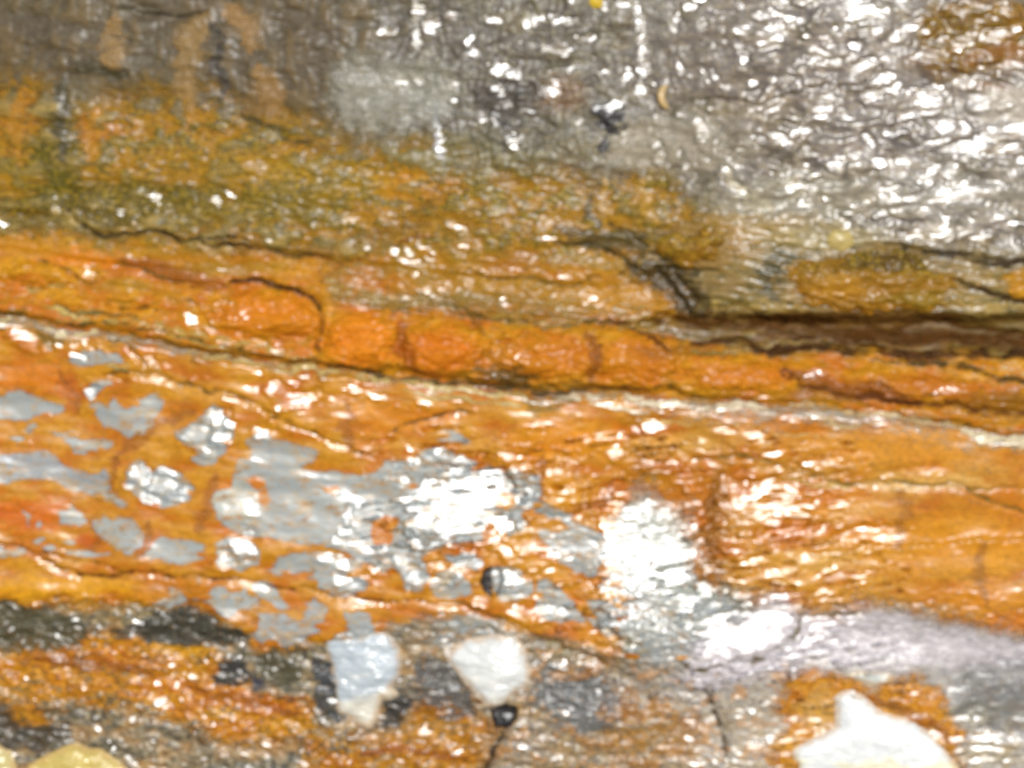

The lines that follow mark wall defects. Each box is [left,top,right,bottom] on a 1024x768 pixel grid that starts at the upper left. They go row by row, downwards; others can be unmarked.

damp [411,0,424,51]
damp [474,78,547,151]
damp [590,104,778,215]
crack [68,210,369,266]
damp [556,193,711,318]
crack [0,260,674,431]
rust [0,74,1024,657]
crack [420,222,1024,416]
peeling [0,379,740,667]
rust [0,630,494,768]
spalling [491,704,516,727]
rust [765,667,966,768]